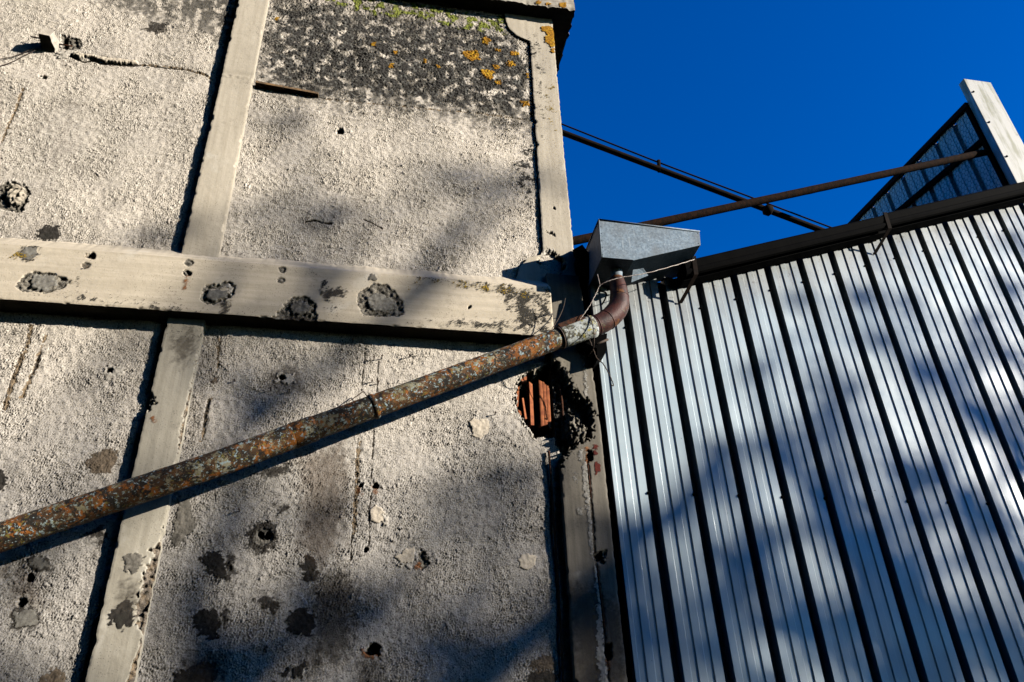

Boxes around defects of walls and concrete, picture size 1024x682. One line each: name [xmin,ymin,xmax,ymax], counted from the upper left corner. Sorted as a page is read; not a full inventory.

crack [69,52,212,80]
leakage [258,0,551,210]
flaking render [0,182,31,213]
spalling [16,272,70,294]
spalling [200,281,235,314]
spalling [273,296,317,322]
spalling [514,363,592,470]